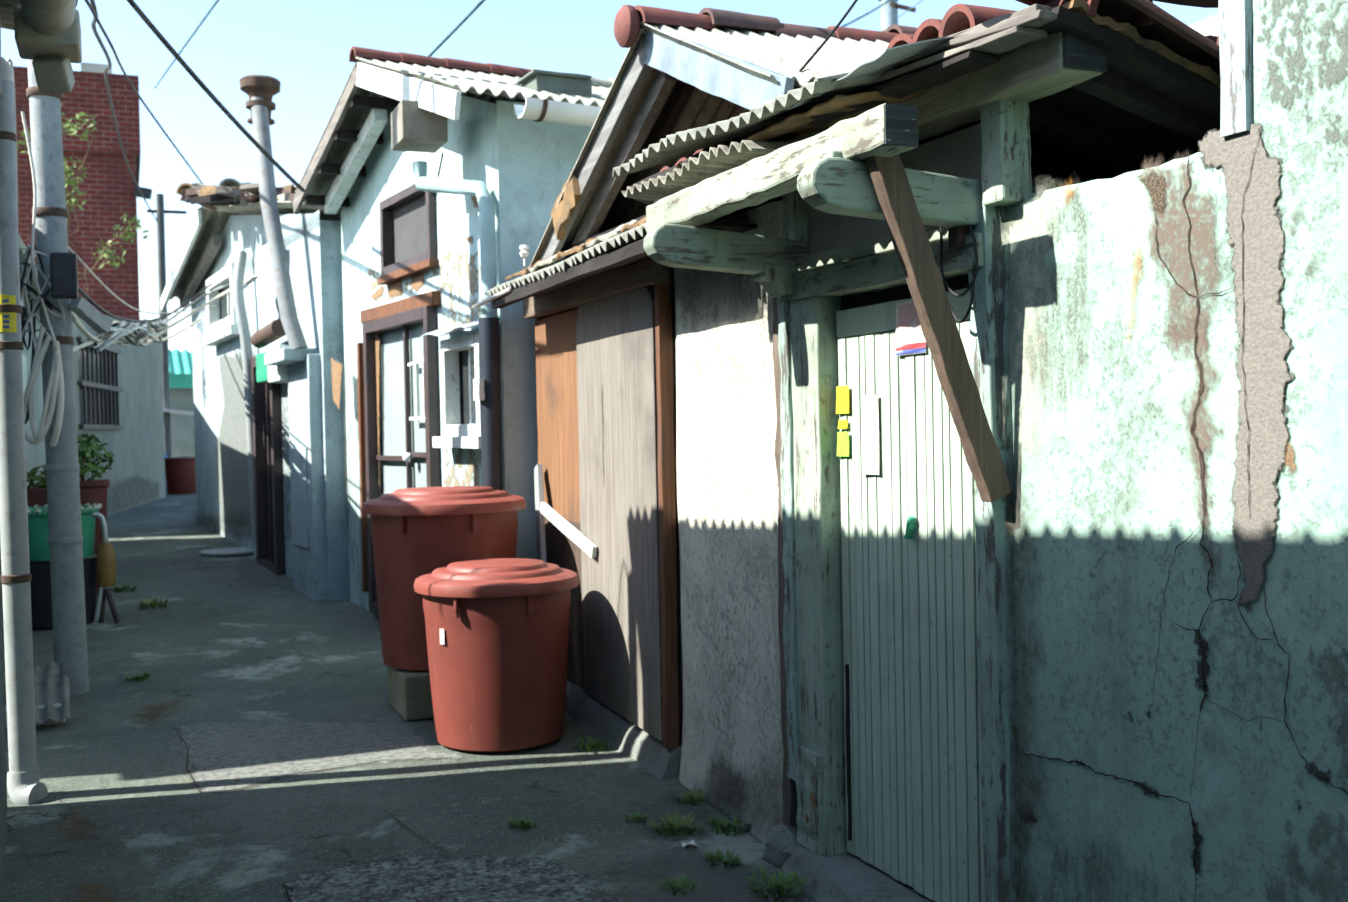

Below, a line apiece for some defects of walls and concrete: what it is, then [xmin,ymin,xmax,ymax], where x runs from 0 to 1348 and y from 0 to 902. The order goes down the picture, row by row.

peeling [368,236,482,332]
crack [1015,132,1348,820]
leakage [1143,159,1222,525]
spalling [1285,444,1296,471]